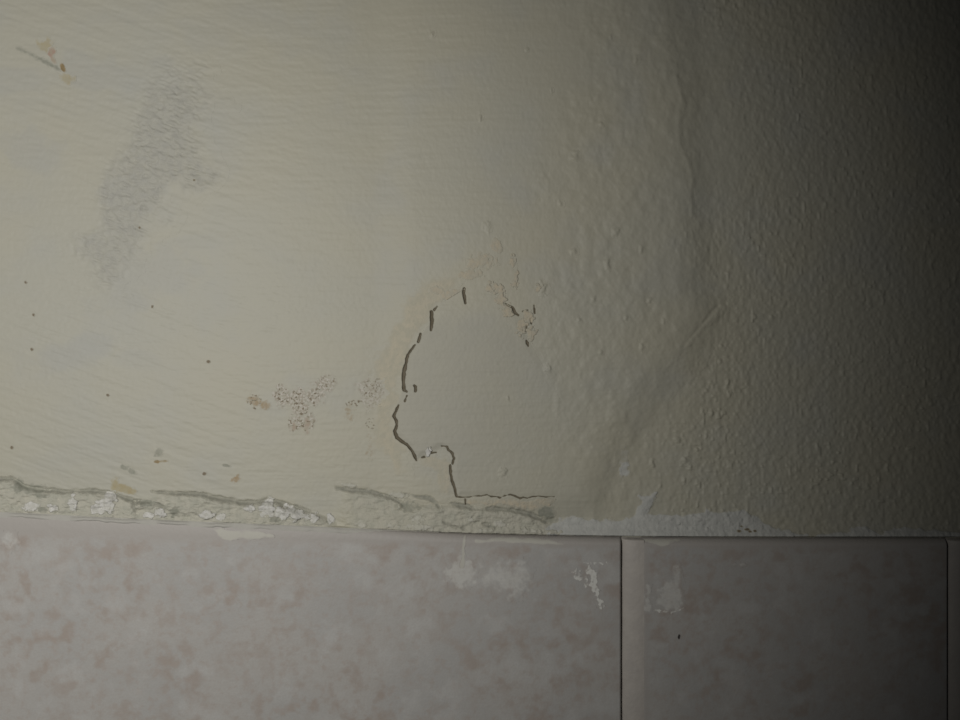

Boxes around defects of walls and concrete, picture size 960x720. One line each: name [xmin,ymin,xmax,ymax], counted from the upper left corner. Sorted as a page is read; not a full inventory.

peeling [0,237,563,535]
crack [460,287,468,304]
crack [392,303,555,505]